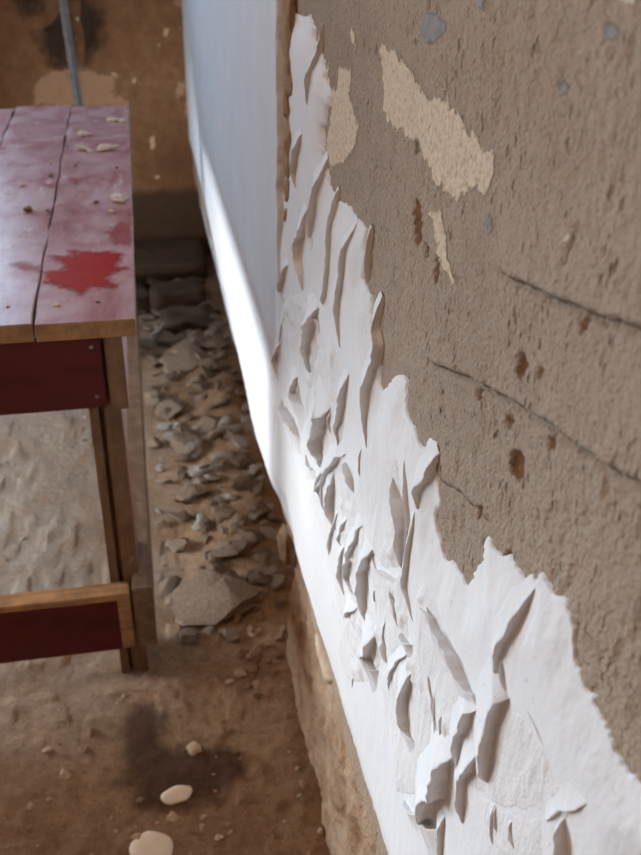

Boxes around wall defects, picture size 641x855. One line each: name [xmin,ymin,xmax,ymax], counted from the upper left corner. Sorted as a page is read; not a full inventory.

spalling [325,63,359,170]
spalling [379,43,494,202]
spalling [414,199,455,285]
crack [505,273,641,330]
hole [514,352,529,379]
hole [509,449,525,479]
crack [435,364,641,482]